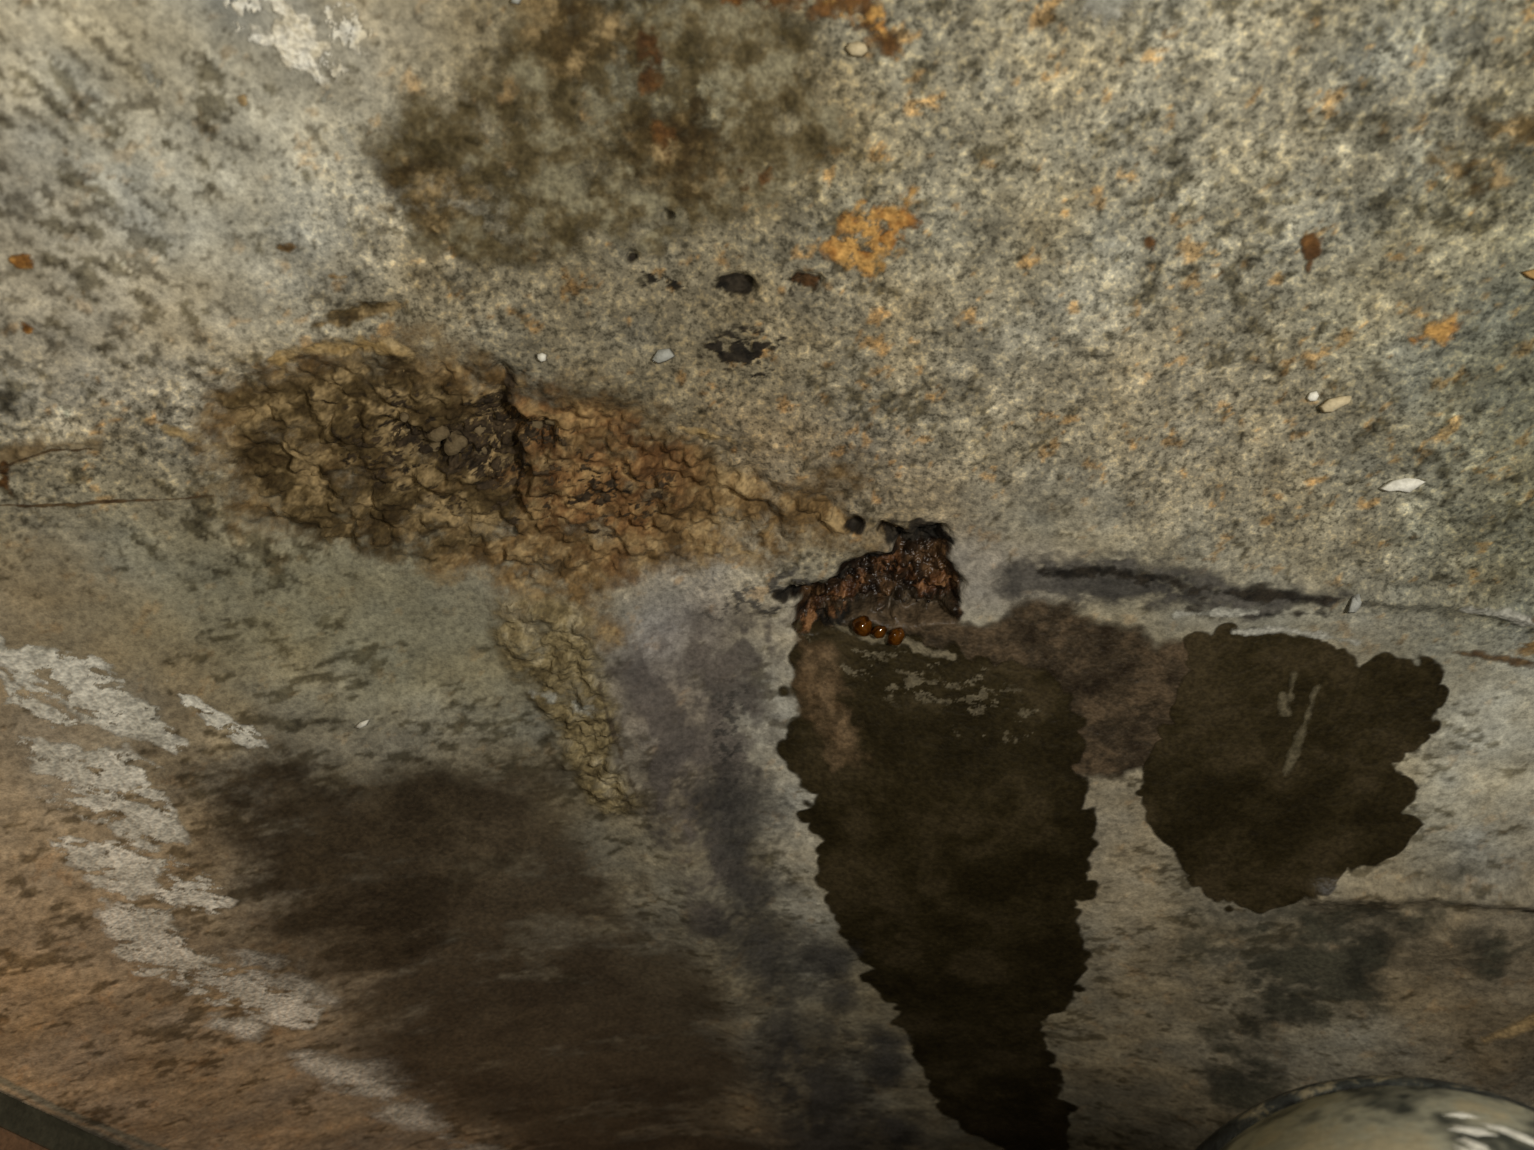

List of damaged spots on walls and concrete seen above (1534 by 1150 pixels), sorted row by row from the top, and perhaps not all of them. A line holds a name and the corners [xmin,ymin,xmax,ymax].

rust [637,29,662,94]
rust [722,0,901,56]
damp [224,0,844,264]
rust [820,187,917,277]
damp [642,271,686,290]
damp [700,326,785,378]
spalling [161,301,963,645]
damp [0,553,1449,1150]